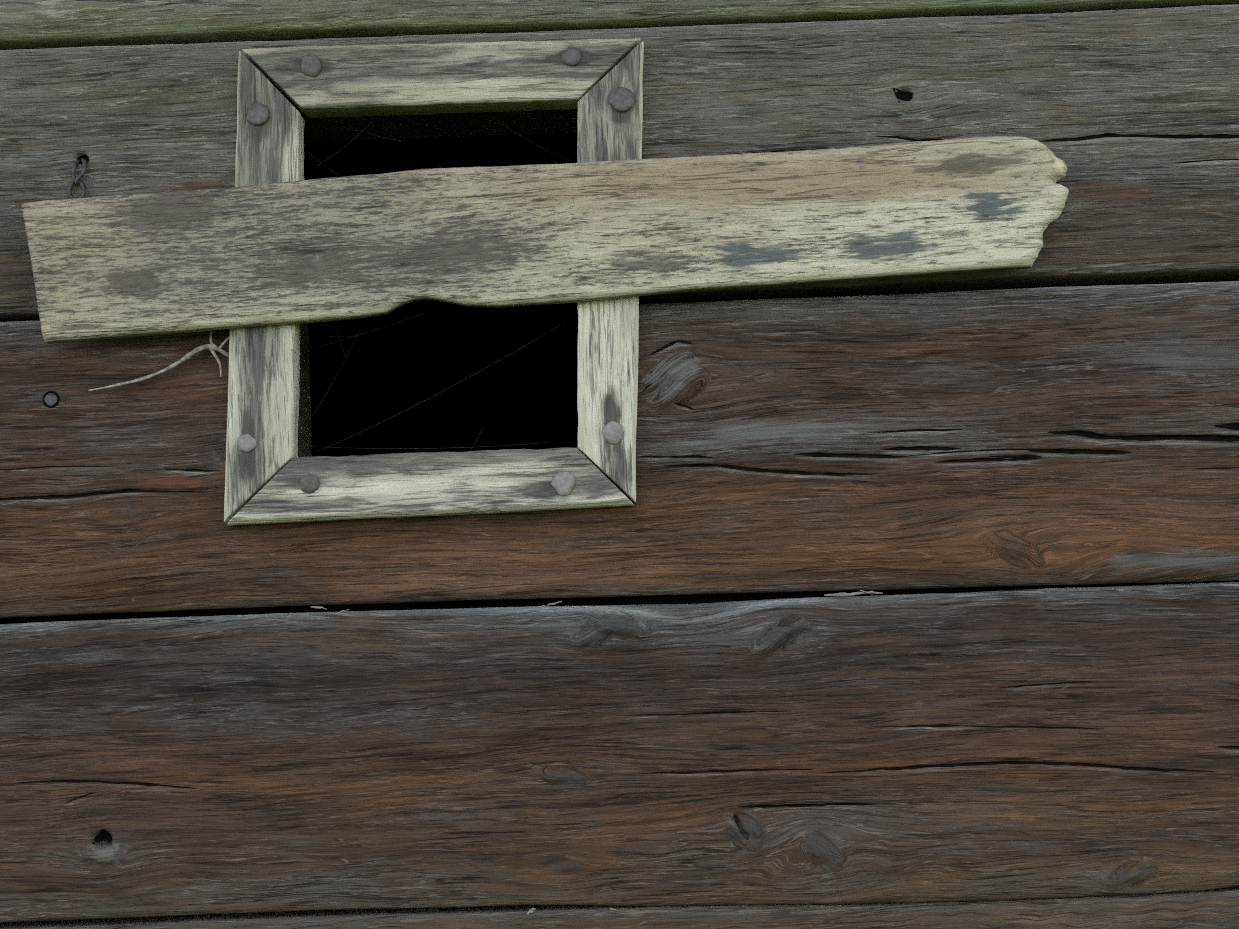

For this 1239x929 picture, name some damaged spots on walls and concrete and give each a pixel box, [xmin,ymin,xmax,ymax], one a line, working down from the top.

crack [878,134,945,142]
crack [1039,133,1239,163]
crack [640,423,1239,476]
crack [1000,680,1088,688]
crack [875,722,1105,730]
crack [648,746,1239,774]
crack [734,803,875,840]